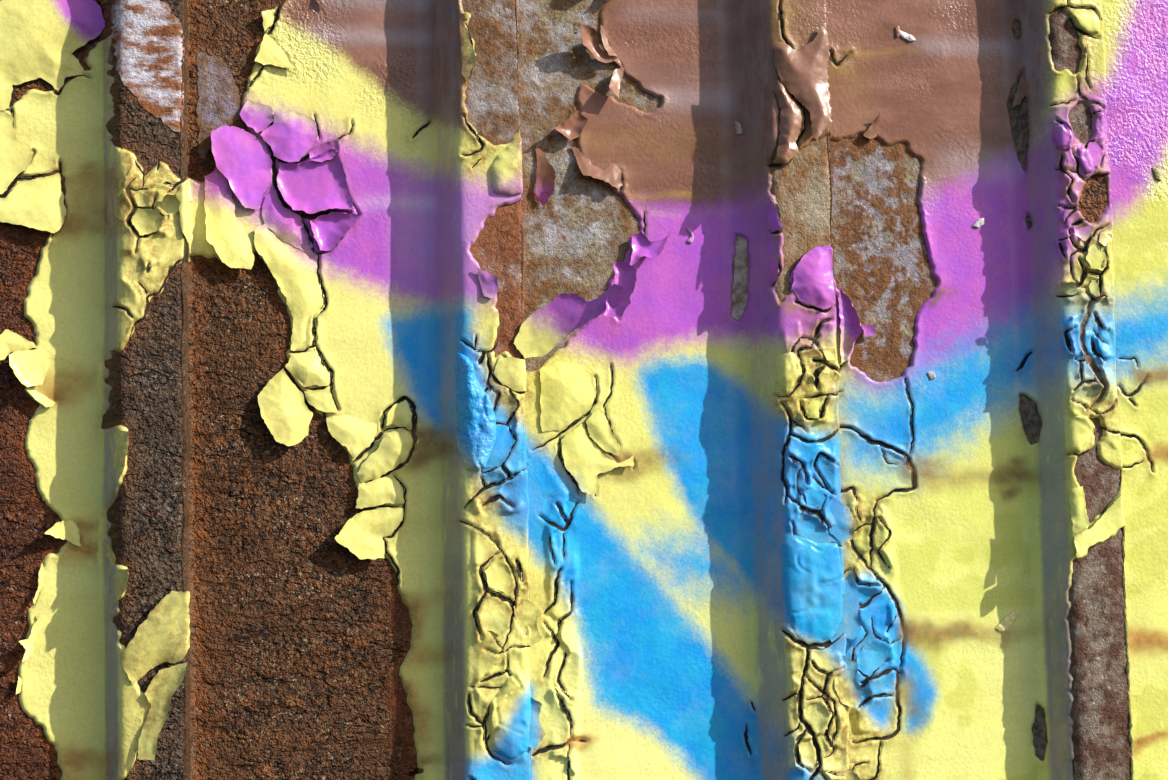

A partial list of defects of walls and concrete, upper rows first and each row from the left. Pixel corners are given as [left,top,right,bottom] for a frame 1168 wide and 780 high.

crack [0,161,67,238]
crack [5,41,89,128]
rust [70,524,97,555]
peeling [0,0,417,780]
crack [459,334,635,780]
peeling [459,0,670,495]
peeling [806,400,822,418]
crack [772,263,917,780]
peeling [762,25,937,382]
peeling [1059,103,1112,296]
peeling [1068,418,1131,780]
crack [1048,0,1153,472]